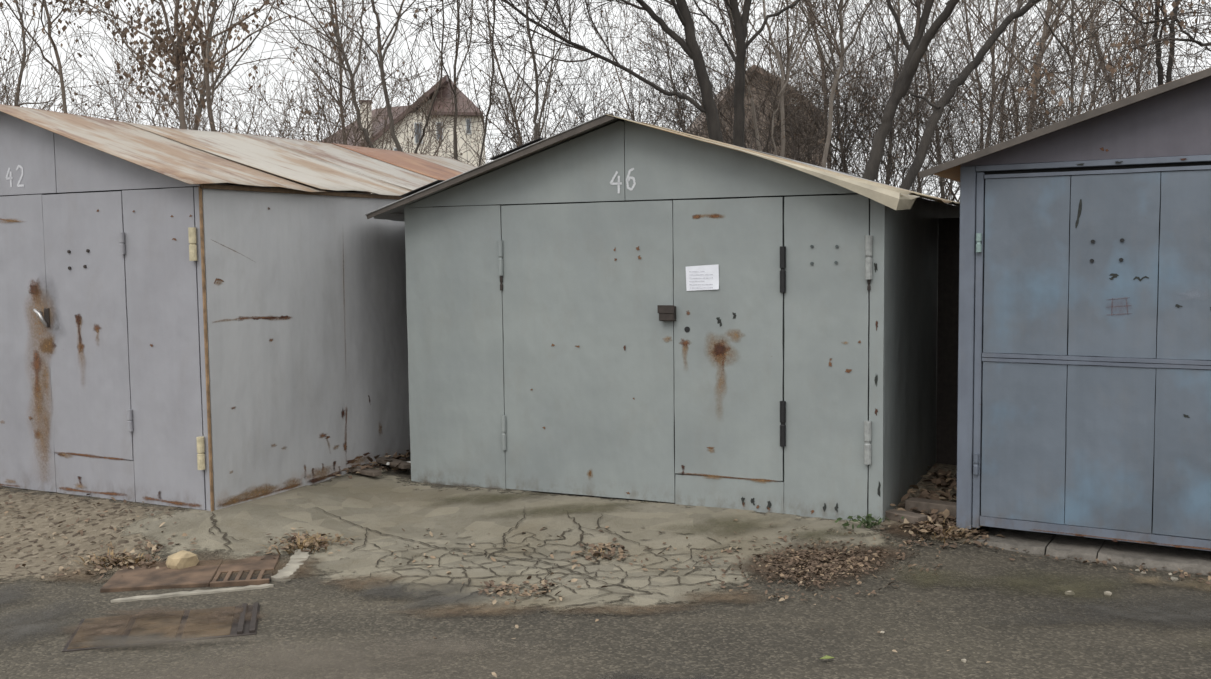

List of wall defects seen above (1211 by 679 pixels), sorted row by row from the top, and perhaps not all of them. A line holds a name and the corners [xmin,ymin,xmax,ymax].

rust [29,280,56,447]
rust [75,314,100,359]
rust [710,332,739,388]
rust [222,409,347,506]
crack [317,507,760,606]